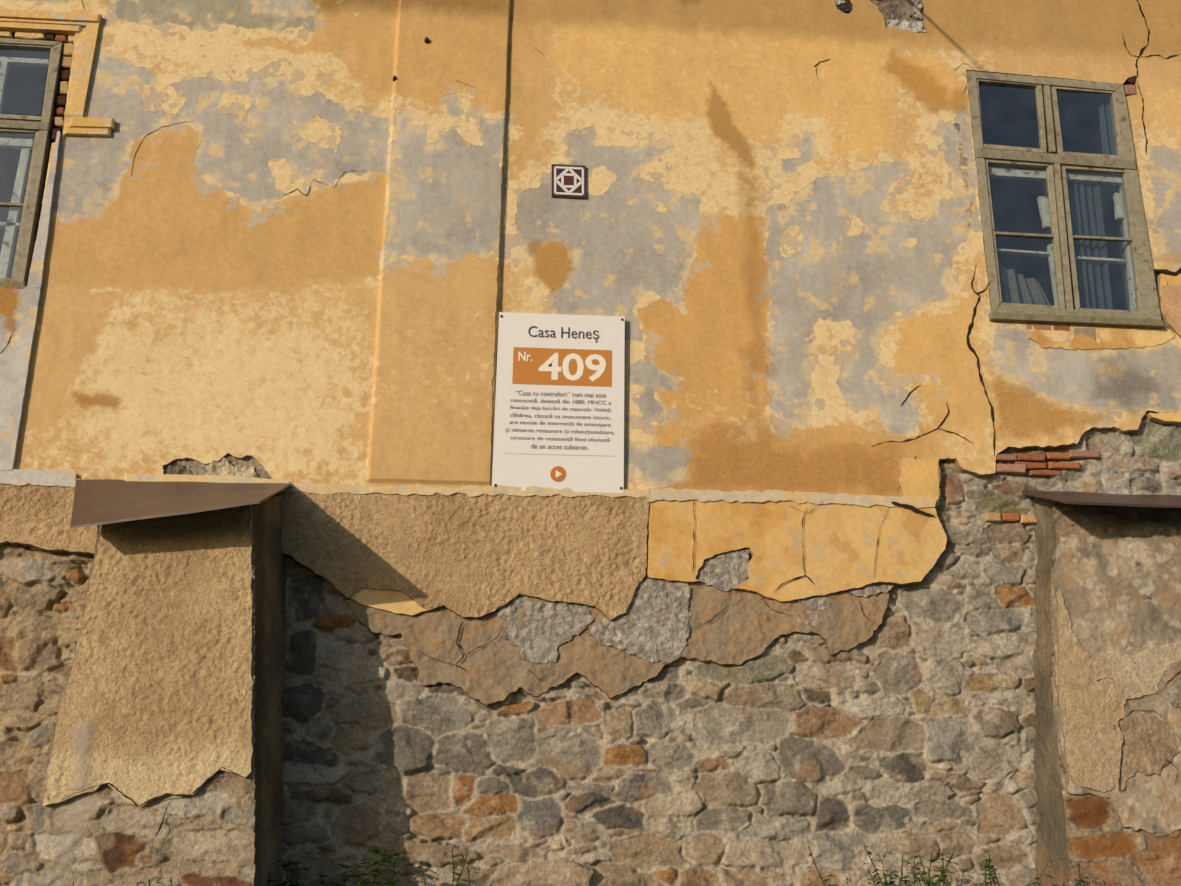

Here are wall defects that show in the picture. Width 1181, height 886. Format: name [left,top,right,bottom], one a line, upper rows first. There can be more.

peeling [110,0,320,33]
peeling [0,30,701,341]
water stain [708,94,753,165]
crack [1123,0,1179,150]
peeling [763,106,983,438]
crack [871,264,996,459]
peeling [987,146,1181,424]
crack [423,622,503,672]
flaking render [342,548,894,706]
crack [761,500,825,617]
crack [874,486,935,574]
flaking render [1056,589,1181,793]